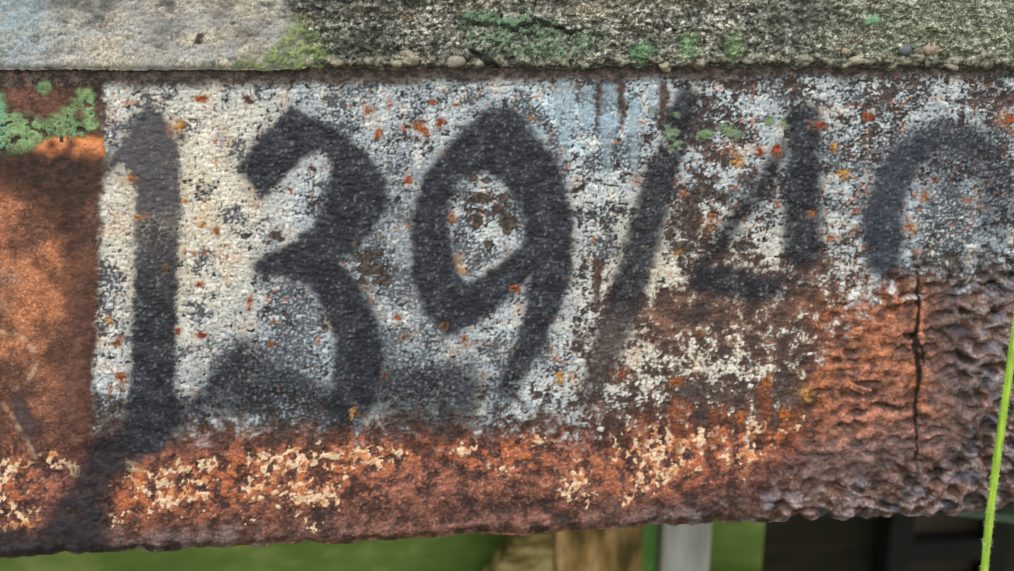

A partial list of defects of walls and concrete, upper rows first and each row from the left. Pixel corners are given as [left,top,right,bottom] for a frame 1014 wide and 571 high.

spalling [331,50,485,71]
spalling [653,58,710,73]
spalling [777,44,962,71]
corrosion [617,84,627,124]
corrosion [660,84,670,114]
corrosion [401,119,446,137]
corrosion [756,144,781,156]
peeling [0,75,1014,519]
corrosion [0,176,120,538]
crack [911,267,927,472]
corrosion [95,258,1014,532]
peeling [0,449,80,532]